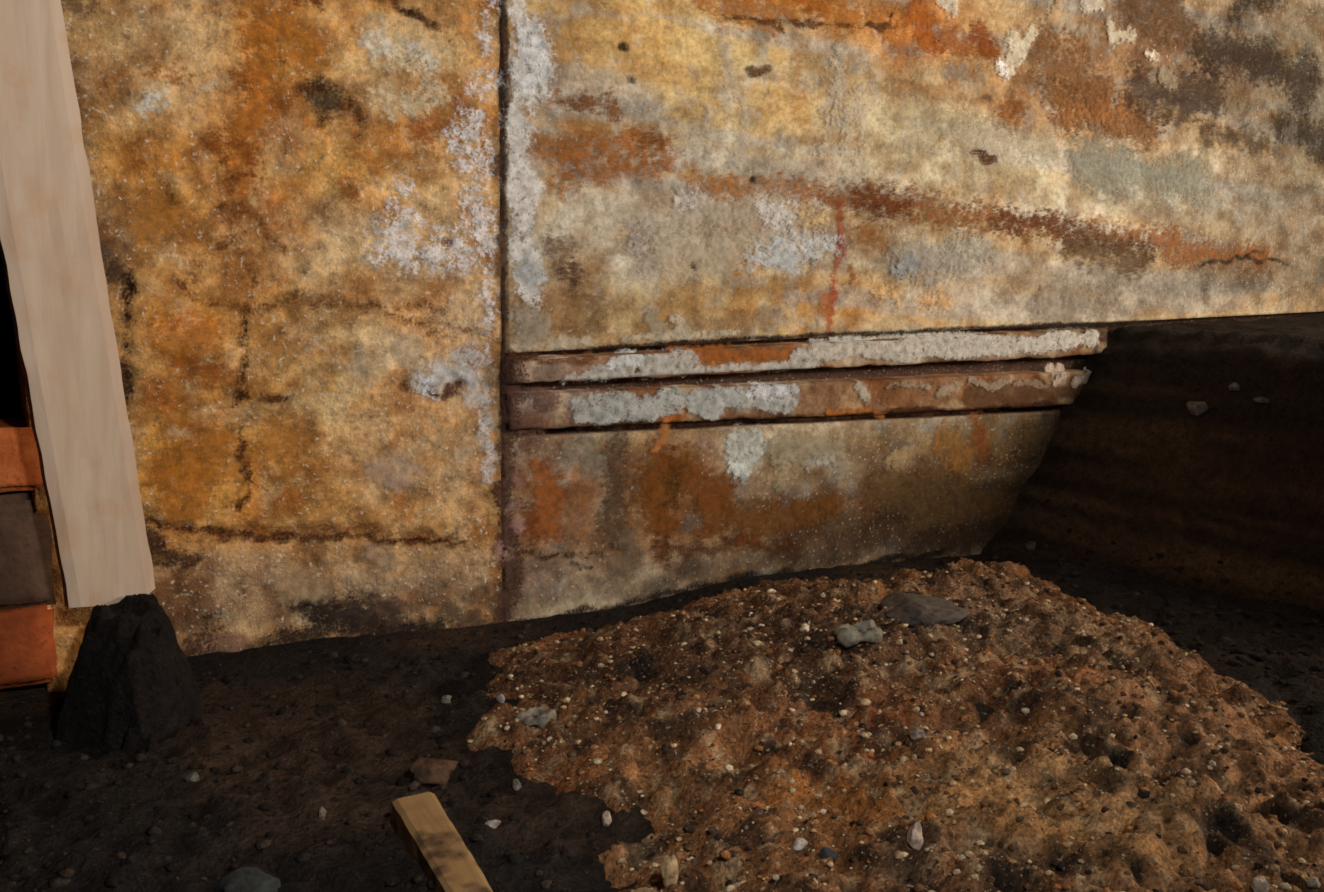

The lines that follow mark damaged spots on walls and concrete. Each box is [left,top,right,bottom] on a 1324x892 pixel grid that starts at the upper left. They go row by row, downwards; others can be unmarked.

corrosion [203,0,330,205]
crack [382,0,439,30]
corrosion [349,95,473,176]
corrosion [994,18,1229,153]
peeling [1076,0,1179,89]
efflorescence [346,0,501,483]
peeling [494,0,1099,495]
corrosion [538,87,1273,333]
crack [120,269,137,404]
crack [145,440,465,548]
corrosion [515,456,597,546]
corrosion [579,378,1084,570]